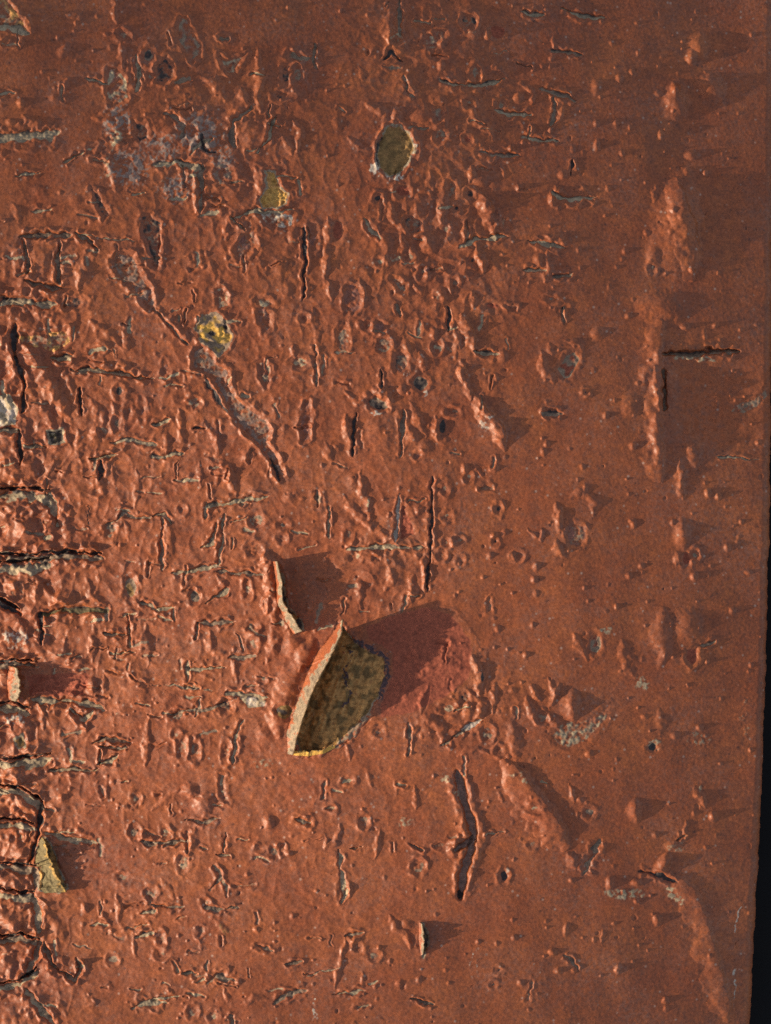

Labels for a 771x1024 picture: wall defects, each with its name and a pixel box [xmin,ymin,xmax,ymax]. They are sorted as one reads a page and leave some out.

peeling [156,282,291,486]
crack [659,340,741,412]
peeling [7,665,97,702]
peeling [215,597,481,759]
peeling [31,808,75,899]
crack [441,717,489,901]